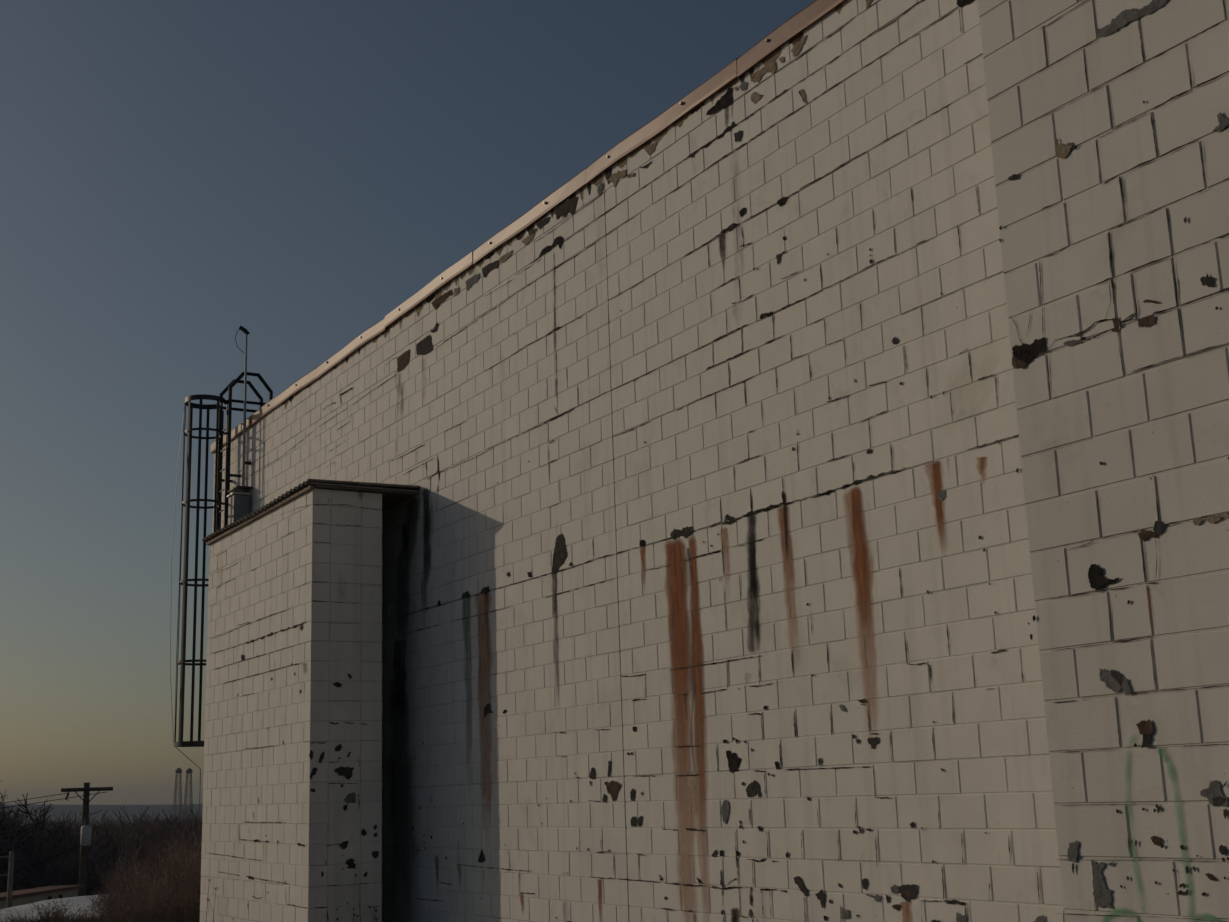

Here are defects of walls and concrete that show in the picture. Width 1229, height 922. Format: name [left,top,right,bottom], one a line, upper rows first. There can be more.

peeling [1097,0,1167,38]
peeling [373,32,807,373]
crack [1010,0,1229,391]
water stain [748,515,759,651]
rust [779,494,790,550]
rust [846,488,873,684]
rust [928,462,942,523]
peeling [1088,564,1119,591]
rust [478,593,491,801]
rust [666,538,705,909]
peeling [723,738,779,797]
peeling [1091,861,1129,909]